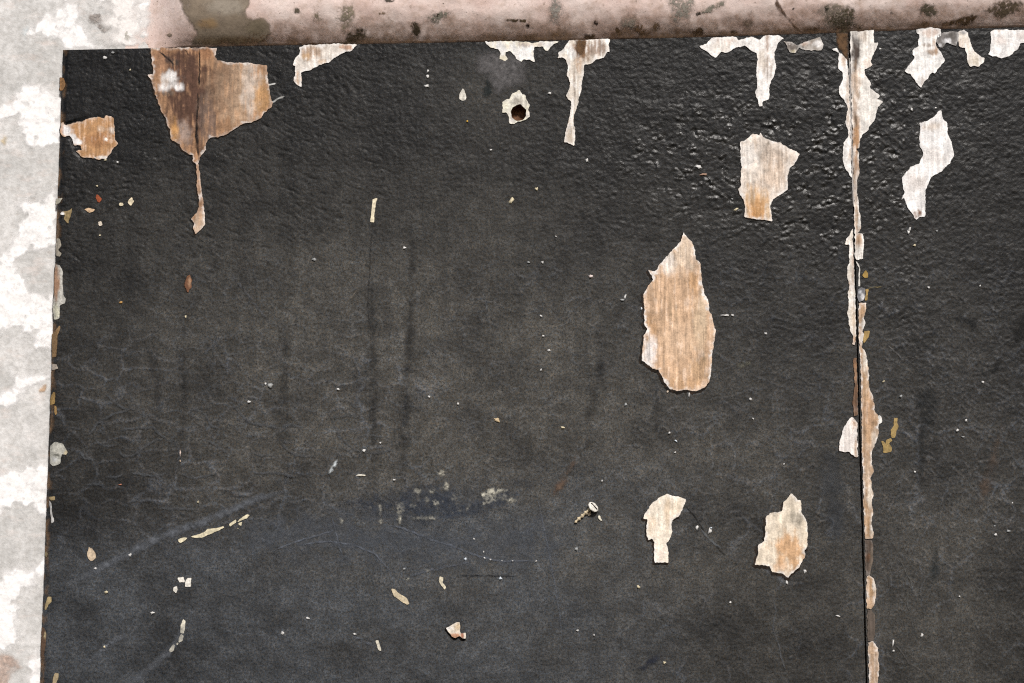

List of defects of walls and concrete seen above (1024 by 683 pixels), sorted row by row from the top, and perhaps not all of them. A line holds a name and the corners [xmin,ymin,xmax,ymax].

peeling [59,115,118,161]
peeling [146,47,273,236]
peeling [292,43,357,87]
peeling [485,39,610,146]
peeling [901,110,954,221]
peeling [904,27,1024,88]
peeling [639,232,716,395]
peeling [699,30,899,683]
peeling [640,494,686,566]